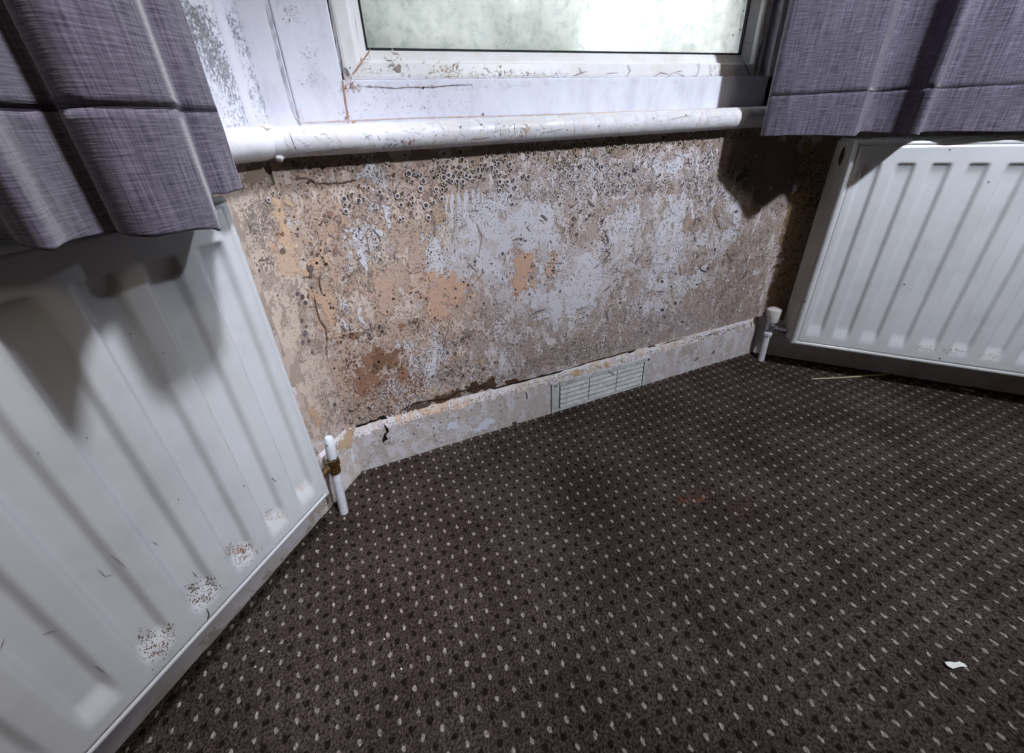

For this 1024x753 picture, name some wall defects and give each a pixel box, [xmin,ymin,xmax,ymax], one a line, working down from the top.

water stain [181,0,853,672]
crack [352,337,688,443]
peeling [371,147,759,420]